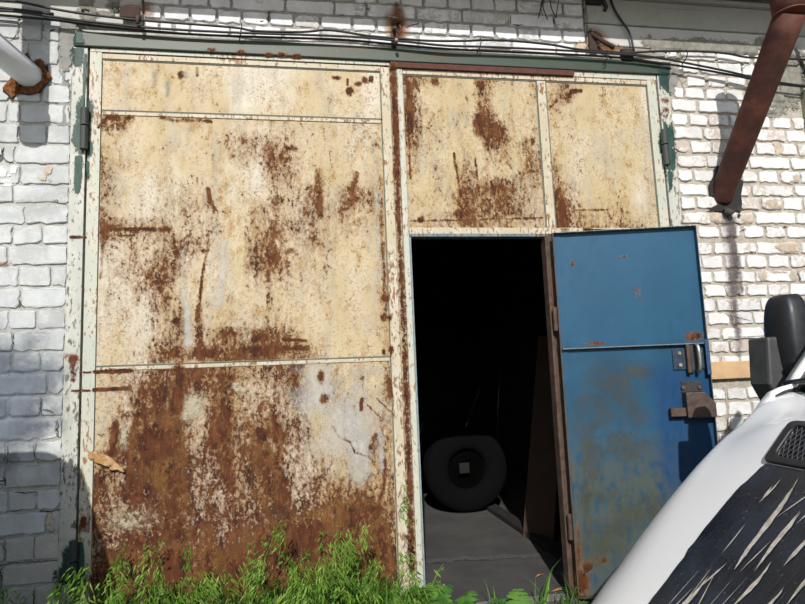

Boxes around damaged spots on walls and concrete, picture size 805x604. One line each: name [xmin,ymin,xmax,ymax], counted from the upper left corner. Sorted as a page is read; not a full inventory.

rust [388,5,405,38]
rust [553,151,653,232]
leakage [723,215,743,334]
rust [65,62,583,604]
rust [575,524,607,596]